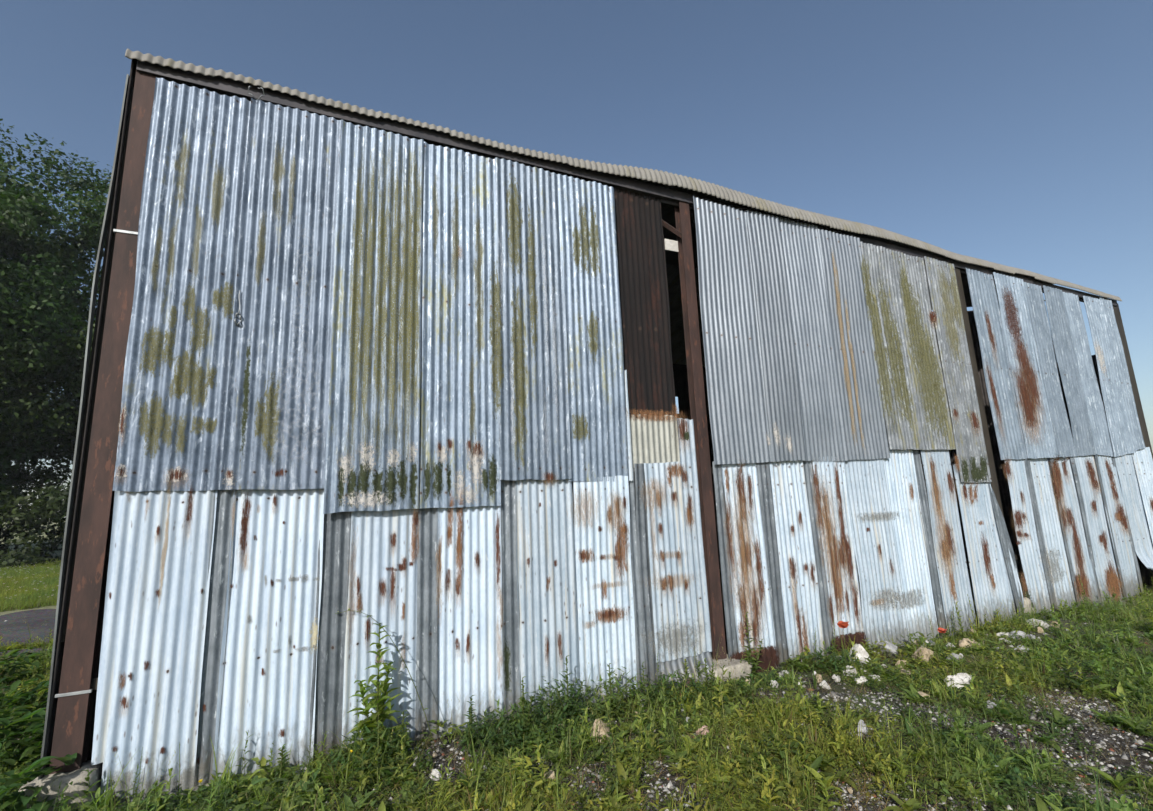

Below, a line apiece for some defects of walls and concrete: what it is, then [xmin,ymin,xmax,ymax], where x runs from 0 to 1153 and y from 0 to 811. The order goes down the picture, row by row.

leakage [137,167,234,459]
leakage [337,144,452,509]
leakage [474,173,538,466]
leakage [572,203,601,276]
rust [614,188,690,440]
leakage [861,256,962,444]
rust [240,494,257,554]
rust [438,492,481,596]
leakage [482,453,499,500]
rust [725,464,779,673]
rust [813,462,867,653]
rust [1052,458,1090,599]